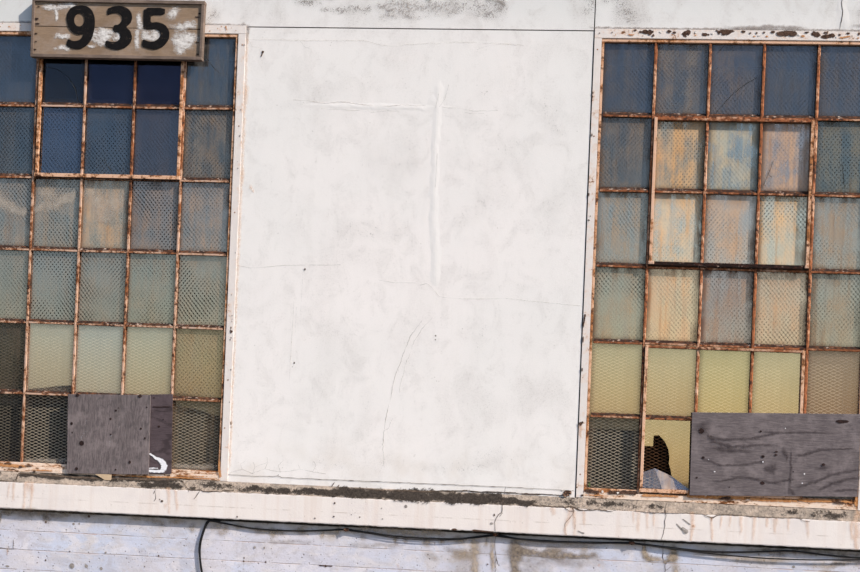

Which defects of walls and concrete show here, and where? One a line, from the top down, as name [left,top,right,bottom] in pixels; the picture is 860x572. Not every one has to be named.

leakage [18,473,537,507]
crack [185,474,607,571]
crack [639,504,810,571]
leakage [458,539,494,572]
leakage [510,540,596,572]
leakage [642,546,678,572]